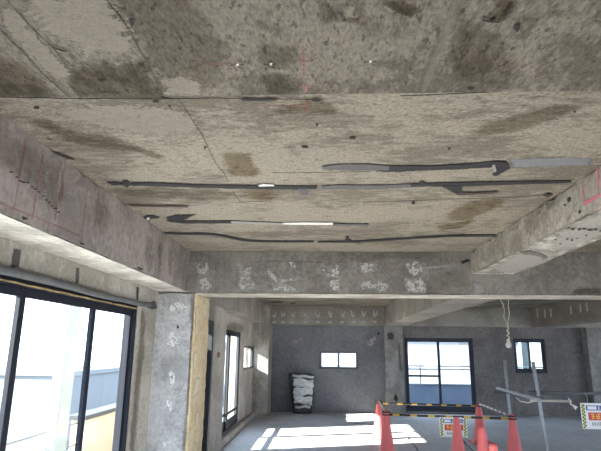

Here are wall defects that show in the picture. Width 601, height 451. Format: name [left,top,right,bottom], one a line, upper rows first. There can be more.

crack [0,2,571,204]
efflorescence [194,261,212,290]
efflorescence [268,271,296,291]
efflorescence [323,265,340,290]
efflorescence [361,262,388,292]
efflorescence [405,261,426,293]